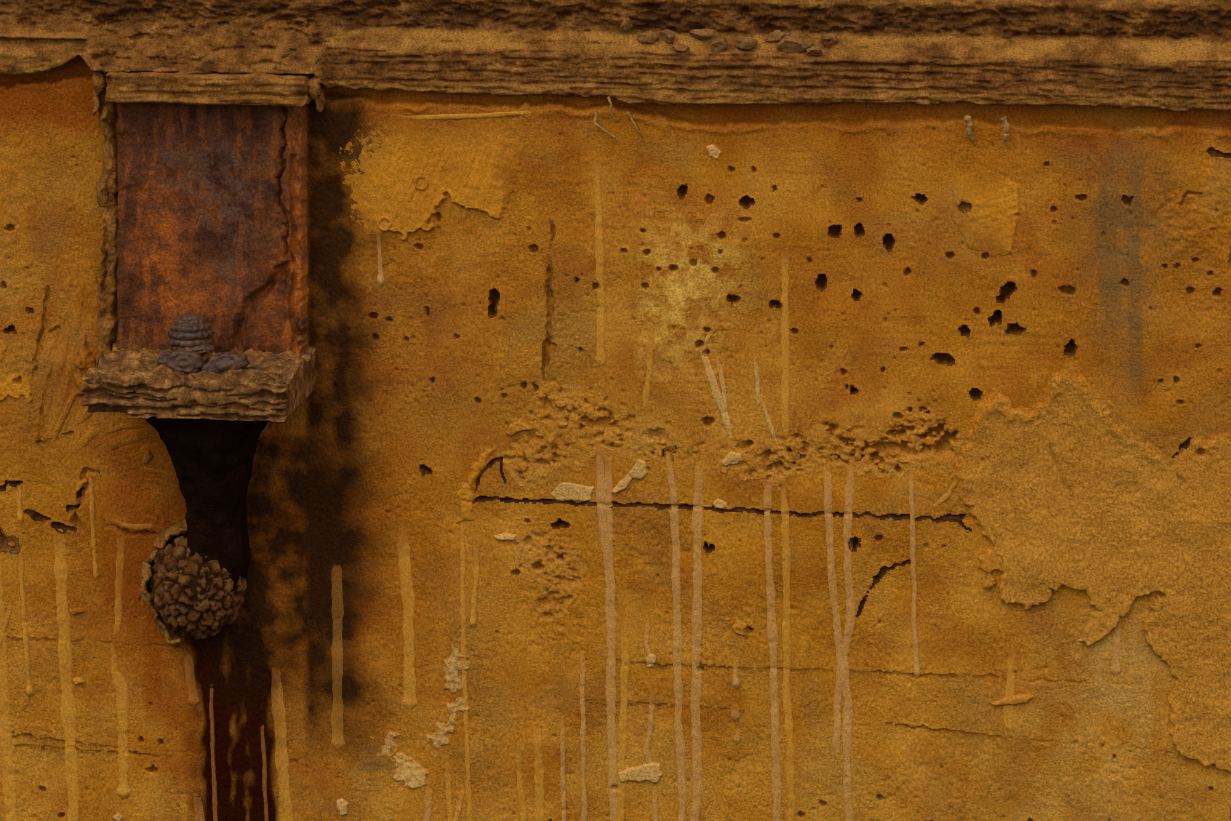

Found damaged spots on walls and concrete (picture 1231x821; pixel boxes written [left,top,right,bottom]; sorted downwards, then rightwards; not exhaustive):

crack [0,471,100,534]
corrosion [65,421,292,821]
crack [472,457,972,532]
peeling [454,360,1231,773]